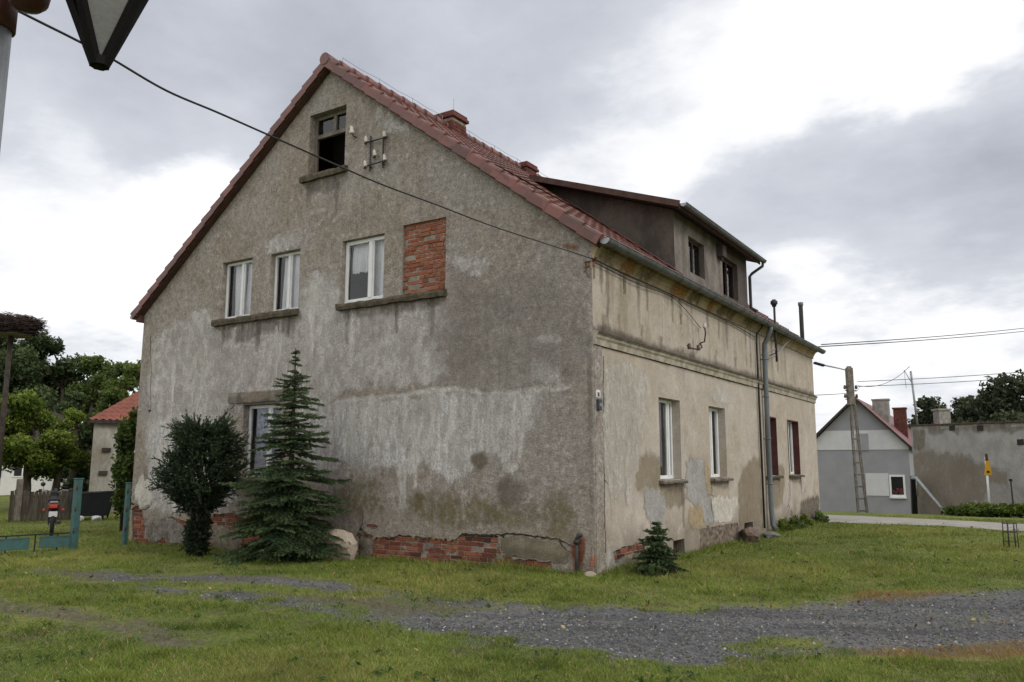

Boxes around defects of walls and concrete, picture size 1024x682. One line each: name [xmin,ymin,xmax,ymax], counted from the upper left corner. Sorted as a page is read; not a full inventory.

peeling [131,270,560,549]
damp [471,453,485,467]
flaking render [358,524,552,570]
crack [462,533,573,556]
flaking render [589,542,643,571]